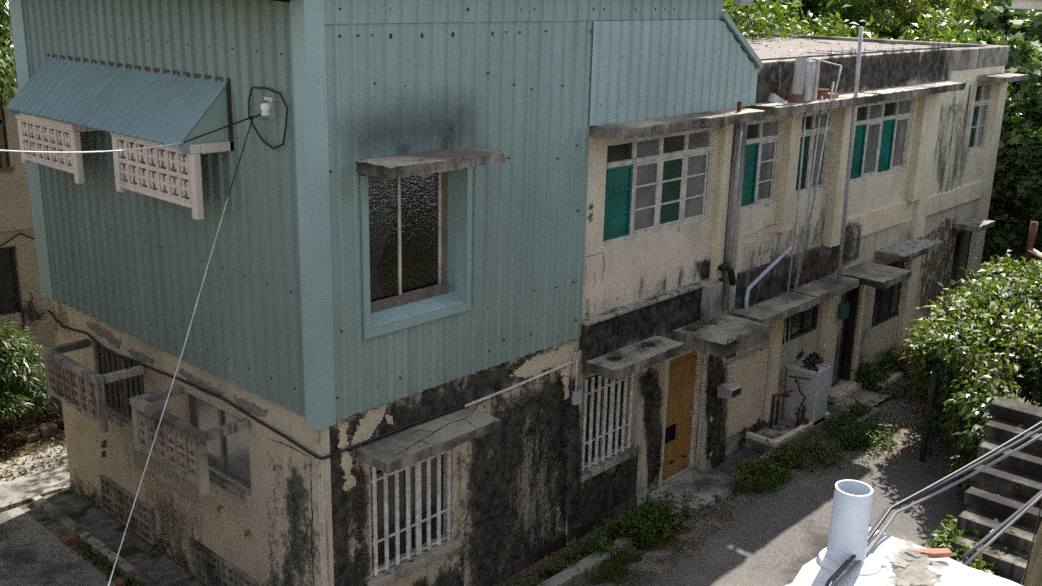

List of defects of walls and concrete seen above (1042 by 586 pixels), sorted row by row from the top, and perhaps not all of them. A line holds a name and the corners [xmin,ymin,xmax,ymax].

water stain [754,42,948,103]
water stain [935,86,971,192]
water stain [263,259,721,586]
water stain [696,355,728,468]
water stain [68,470,193,573]